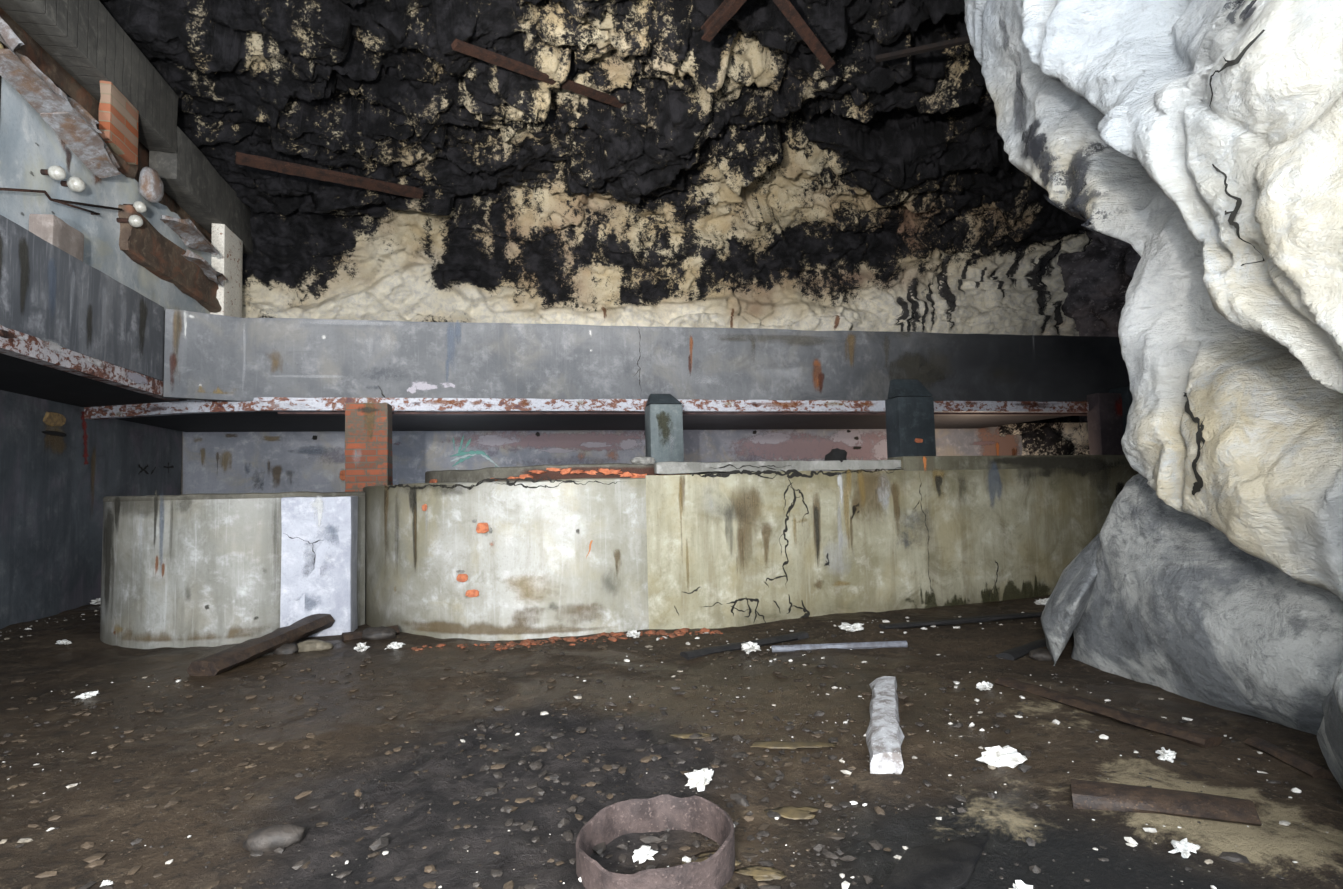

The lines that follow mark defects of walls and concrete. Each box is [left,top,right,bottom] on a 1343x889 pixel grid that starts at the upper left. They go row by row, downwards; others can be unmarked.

peeling [454,431,690,481]
peeling [734,429,887,461]
water stain [103,498,120,605]
crack [674,464,933,623]